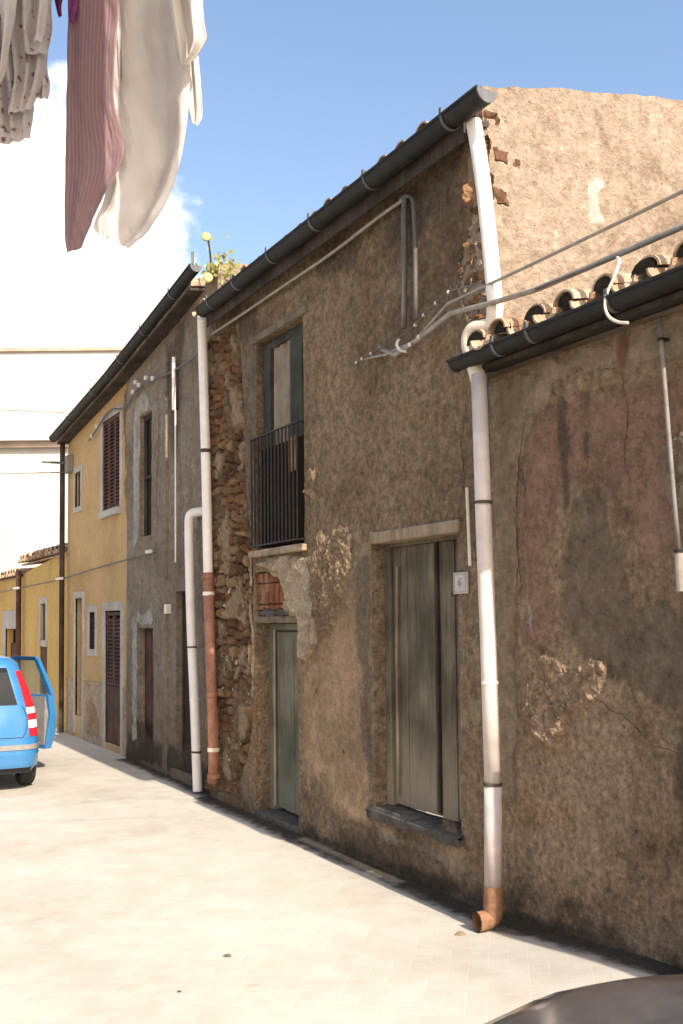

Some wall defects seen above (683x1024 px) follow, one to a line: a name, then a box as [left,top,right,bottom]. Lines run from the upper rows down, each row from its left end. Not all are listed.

spalling [458,178,487,320]
spalling [476,109,520,206]
flaking render [197,327,352,794]
crack [515,427,526,625]
peeling [520,336,683,765]